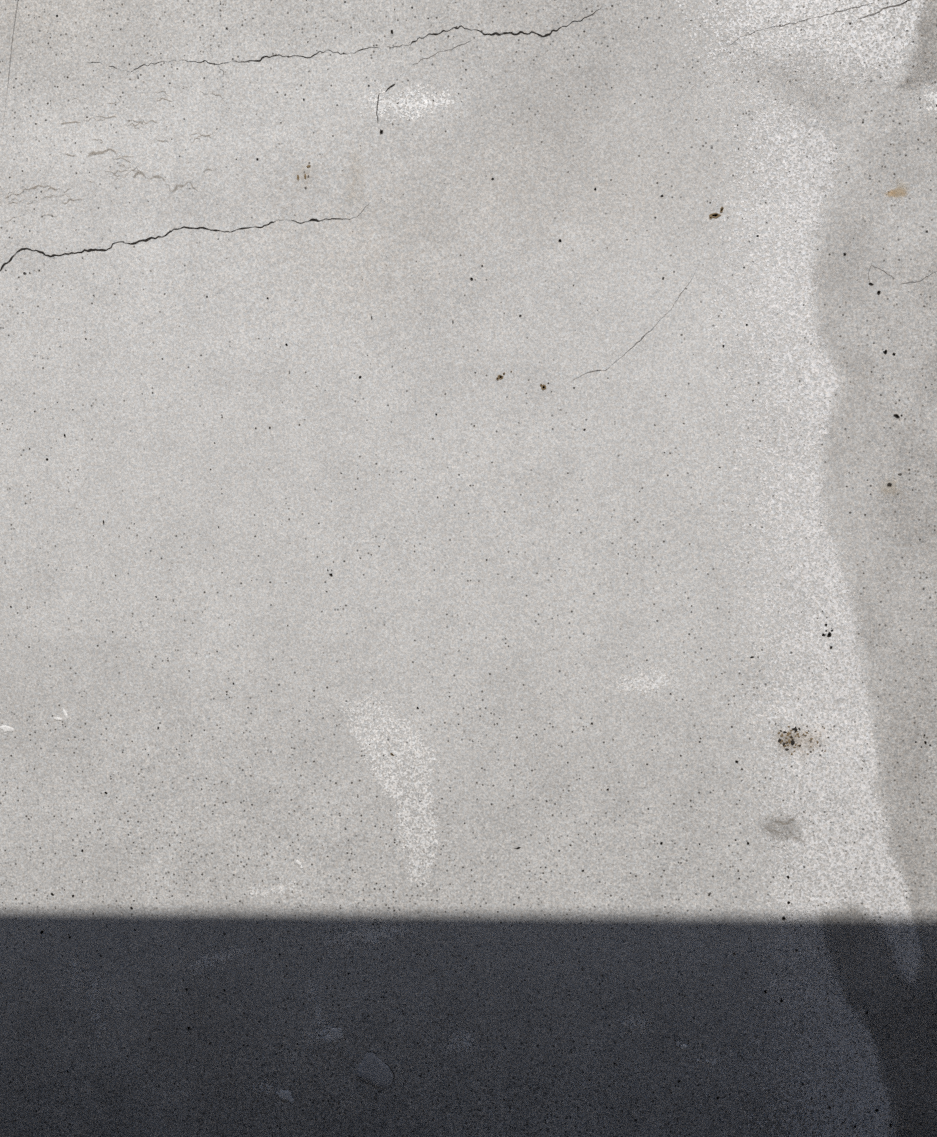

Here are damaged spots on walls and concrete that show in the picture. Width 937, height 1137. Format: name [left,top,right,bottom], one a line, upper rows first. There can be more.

crack [90,9,599,77]
leakage [920,87,937,113]
crack [0,204,369,271]
leakage [648,0,928,1137]